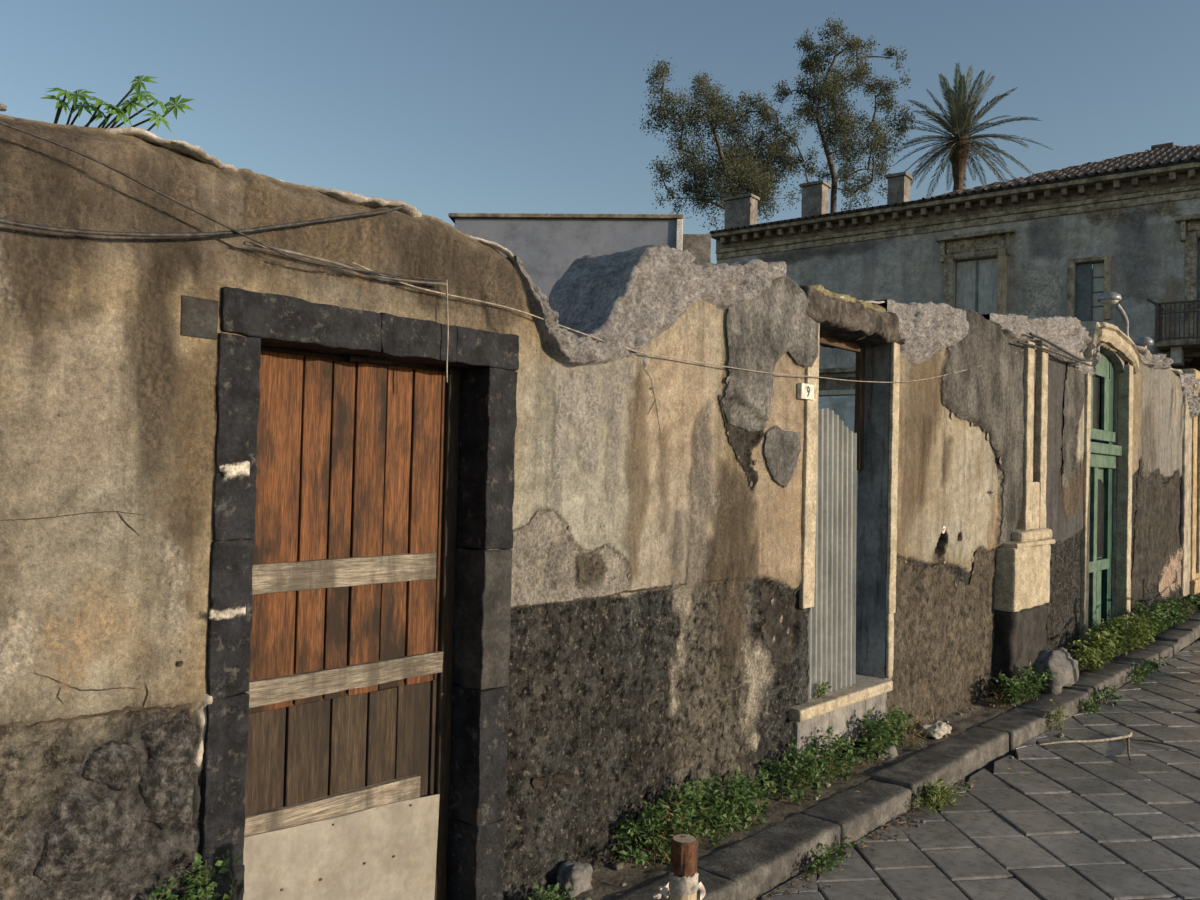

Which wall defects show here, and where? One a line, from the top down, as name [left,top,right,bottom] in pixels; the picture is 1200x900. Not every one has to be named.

leakage [0,117,120,331]
leakage [132,150,210,466]
peeling [1021,268,1062,318]
leakage [173,380,217,527]
spalling [719,394,765,491]
crack [0,511,143,536]
peeling [511,510,633,607]
peeling [886,310,1038,735]
leakage [0,611,31,702]